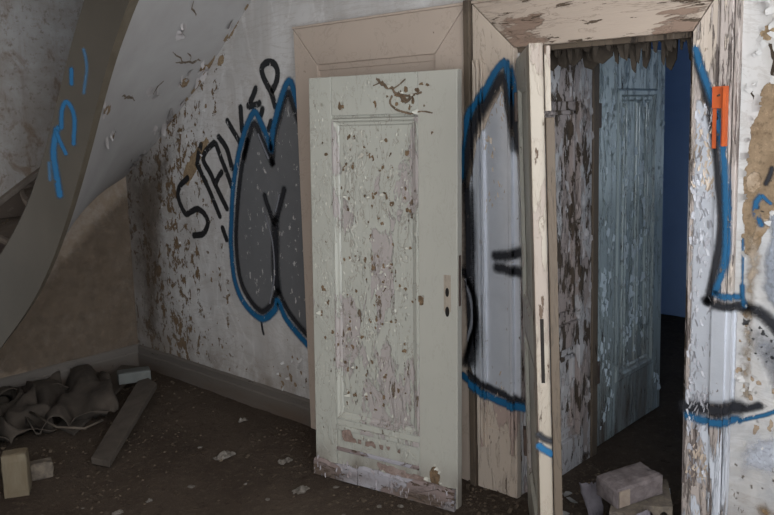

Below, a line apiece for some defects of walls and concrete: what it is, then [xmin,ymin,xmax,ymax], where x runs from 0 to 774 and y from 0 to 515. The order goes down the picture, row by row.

peeling [130,55,225,170]
peeling [734,75,774,401]